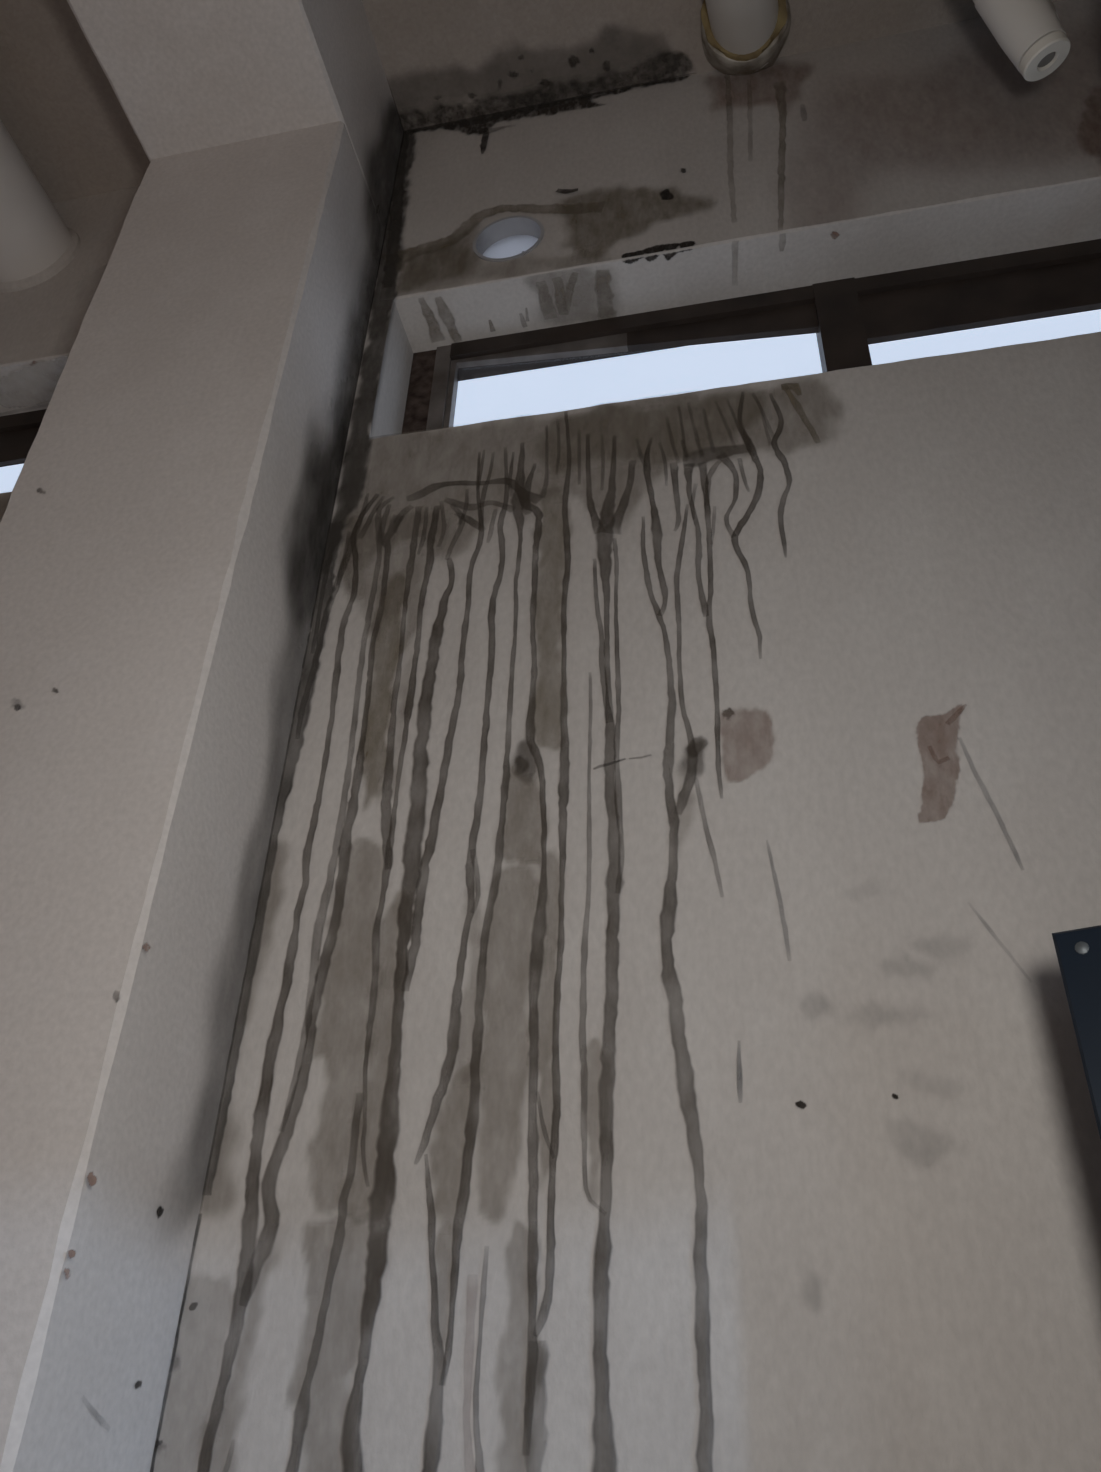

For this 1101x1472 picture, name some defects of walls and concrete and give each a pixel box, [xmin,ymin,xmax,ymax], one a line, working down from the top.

leakage [198,1350,236,1472]
leakage [204,49,825,1472]